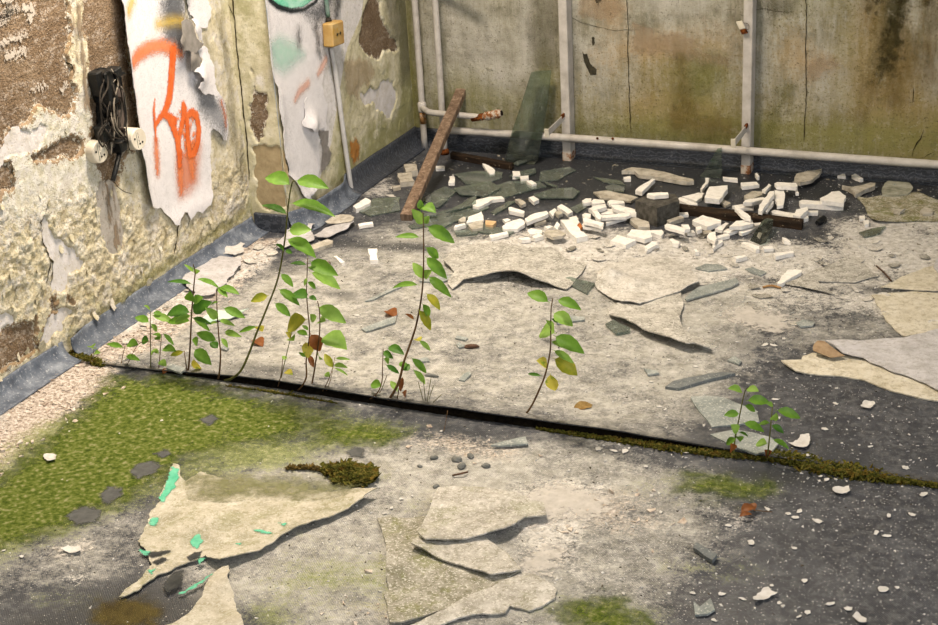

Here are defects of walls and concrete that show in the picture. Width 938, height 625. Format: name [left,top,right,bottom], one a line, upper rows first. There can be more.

flaking render [0,0,80,210]
peeling [82,0,229,225]
flaking render [359,0,397,60]
crack [573,0,631,129]
crack [801,0,809,137]
water stain [878,0,910,70]
peeling [0,217,89,382]